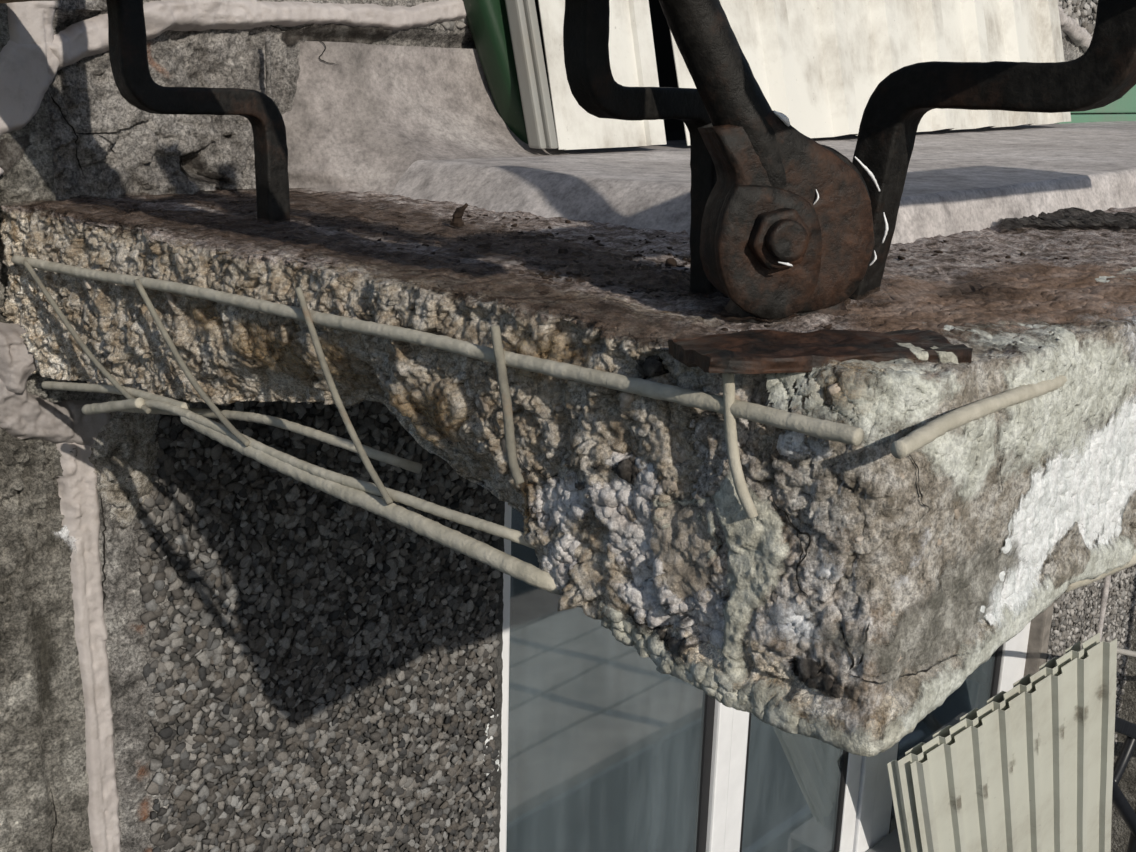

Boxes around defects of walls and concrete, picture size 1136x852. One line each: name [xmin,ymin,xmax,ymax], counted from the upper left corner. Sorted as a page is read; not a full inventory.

crack [49,92,141,178]
rust [23,188,720,380]
rust [847,259,1136,336]
spalling [30,203,1136,735]
crack [909,454,930,509]
damp [653,497,723,558]
crack [743,472,811,603]
crack [840,624,985,685]
crack [49,787,57,852]